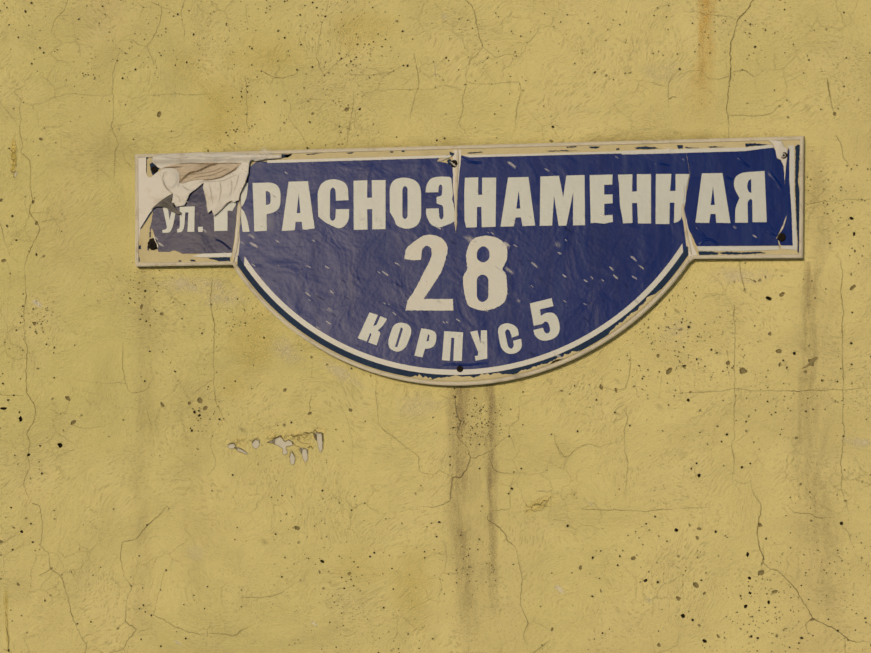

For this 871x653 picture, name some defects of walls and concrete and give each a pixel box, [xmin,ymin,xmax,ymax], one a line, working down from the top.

crack [724,0,763,116]
peeling [227,424,325,465]
crack [757,512,855,642]